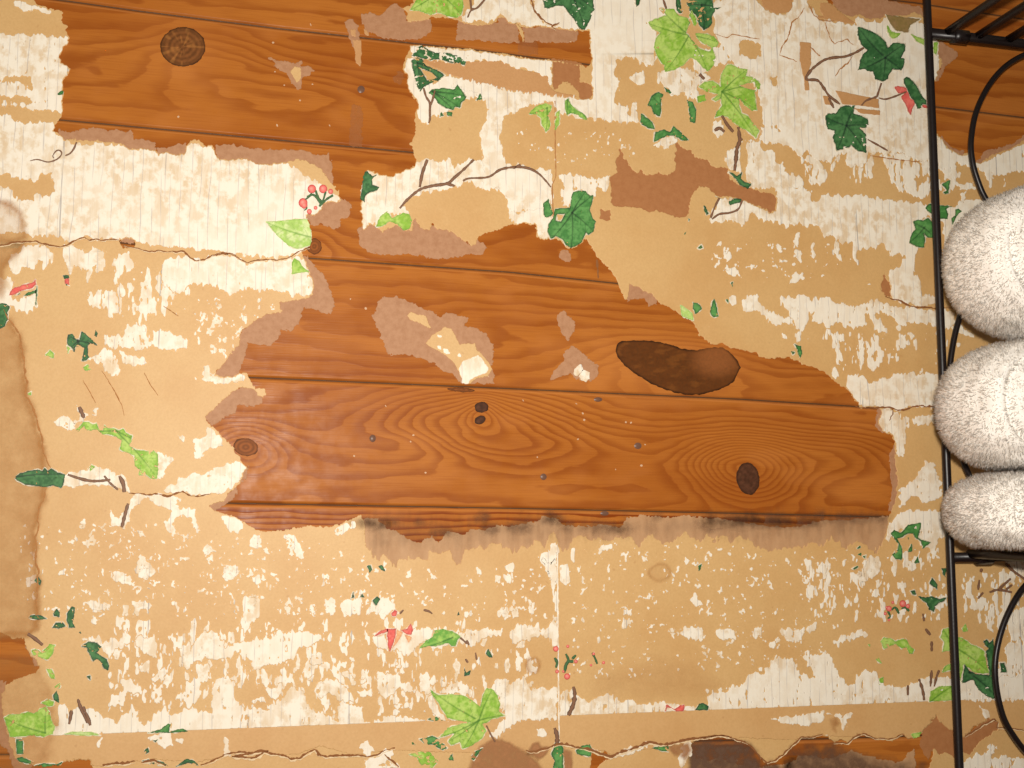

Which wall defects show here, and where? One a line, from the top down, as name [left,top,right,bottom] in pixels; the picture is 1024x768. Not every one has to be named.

peeling [827,0,1024,163]
crack [0,237,310,264]
peeling [34,0,898,600]
crack [102,759,166,767]
crack [201,747,399,768]
crack [526,733,903,764]
peeling [678,705,998,768]
crack [966,718,1024,737]